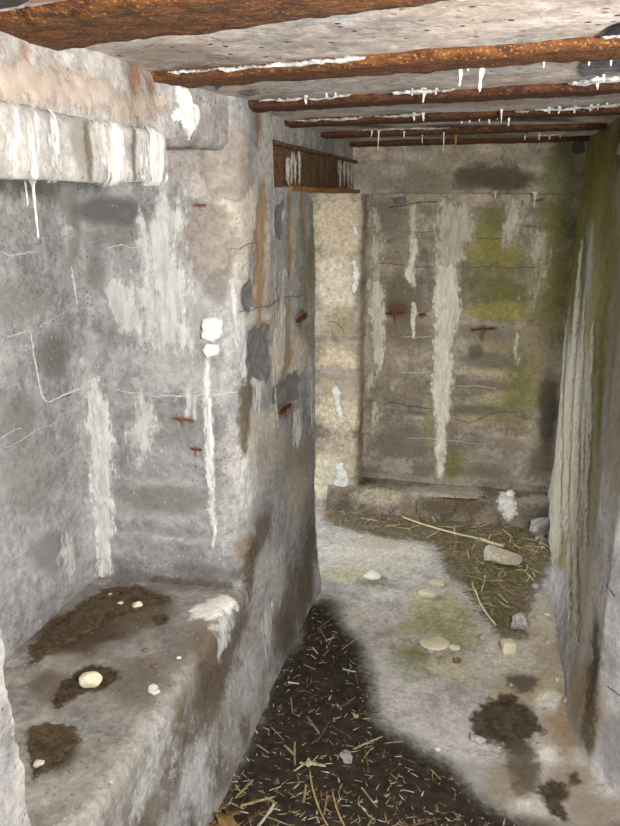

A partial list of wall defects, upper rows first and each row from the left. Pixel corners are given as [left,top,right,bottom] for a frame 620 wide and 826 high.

leakage [168,46,366,75]
leakage [567,76,620,86]
rust [253,182,269,330]
rust [287,191,306,280]
crack [1,311,84,448]
leakage [80,119,264,577]
crack [115,387,241,398]
rust [282,299,307,381]
leakage [412,196,481,500]
crack [405,411,519,444]
leakage [551,237,599,748]
leakage [469,675,581,821]